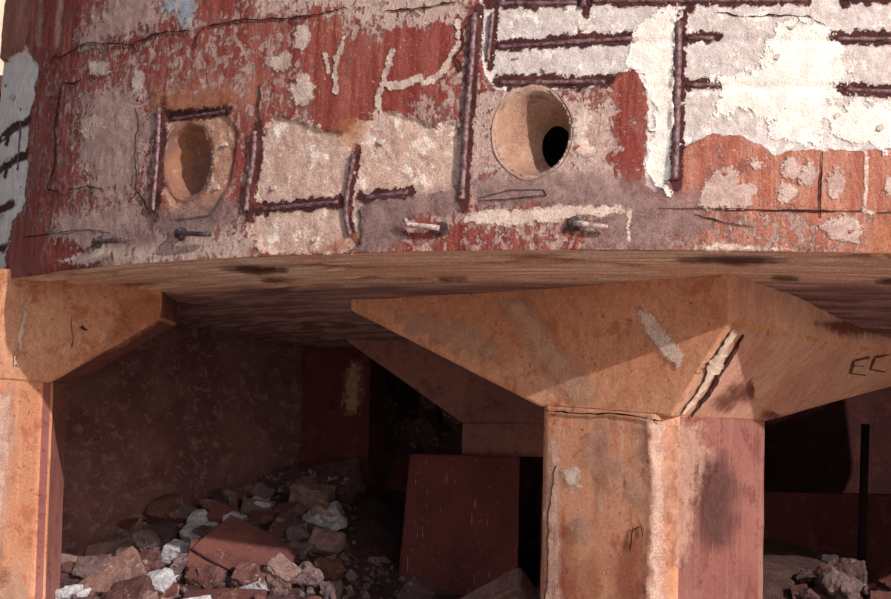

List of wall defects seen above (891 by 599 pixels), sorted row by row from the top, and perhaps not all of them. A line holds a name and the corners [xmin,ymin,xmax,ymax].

spalling [0,45,39,269]
crack [47,79,102,194]
peeling [48,59,237,252]
crack [50,7,345,64]
spalling [246,18,462,256]
spalling [480,0,891,212]
crack [625,7,891,227]
peeling [816,213,865,245]
crack [544,410,661,421]
crack [682,329,744,417]
water stain [544,436,590,599]
water stain [585,421,739,599]